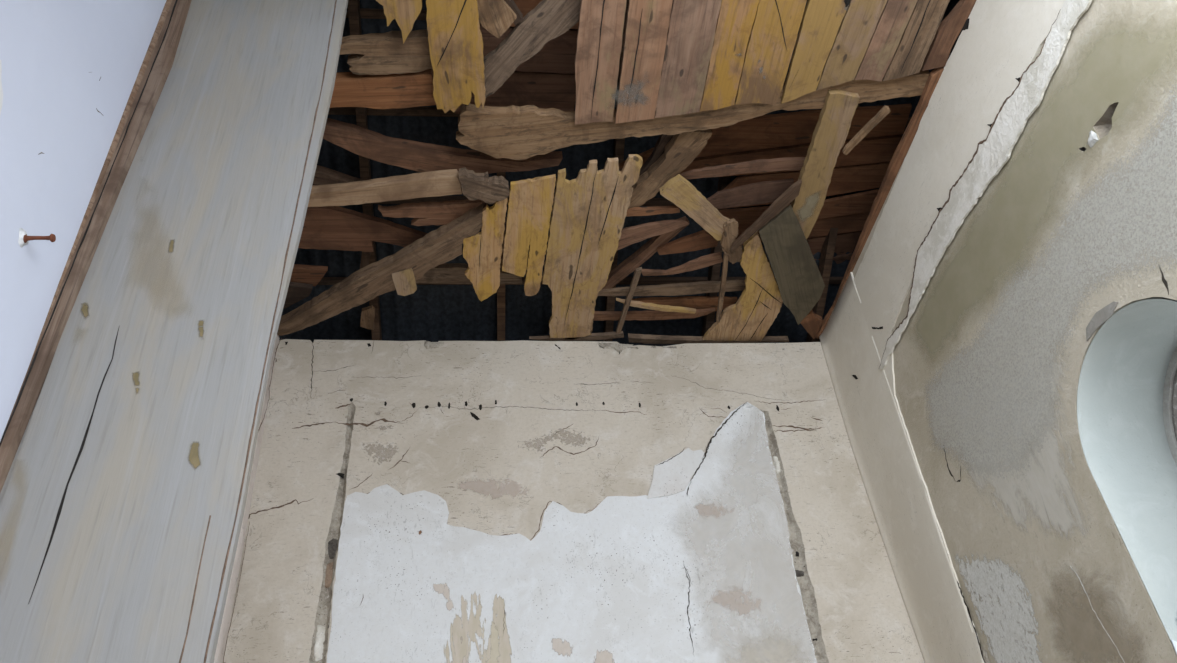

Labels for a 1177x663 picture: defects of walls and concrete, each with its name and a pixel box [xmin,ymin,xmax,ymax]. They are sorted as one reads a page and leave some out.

damp [917,30,1177,479]
flaking render [1079,102,1119,151]
crack [29,328,119,602]
crack [223,499,312,663]
flaking render [314,402,817,663]
damp [1053,585,1142,663]